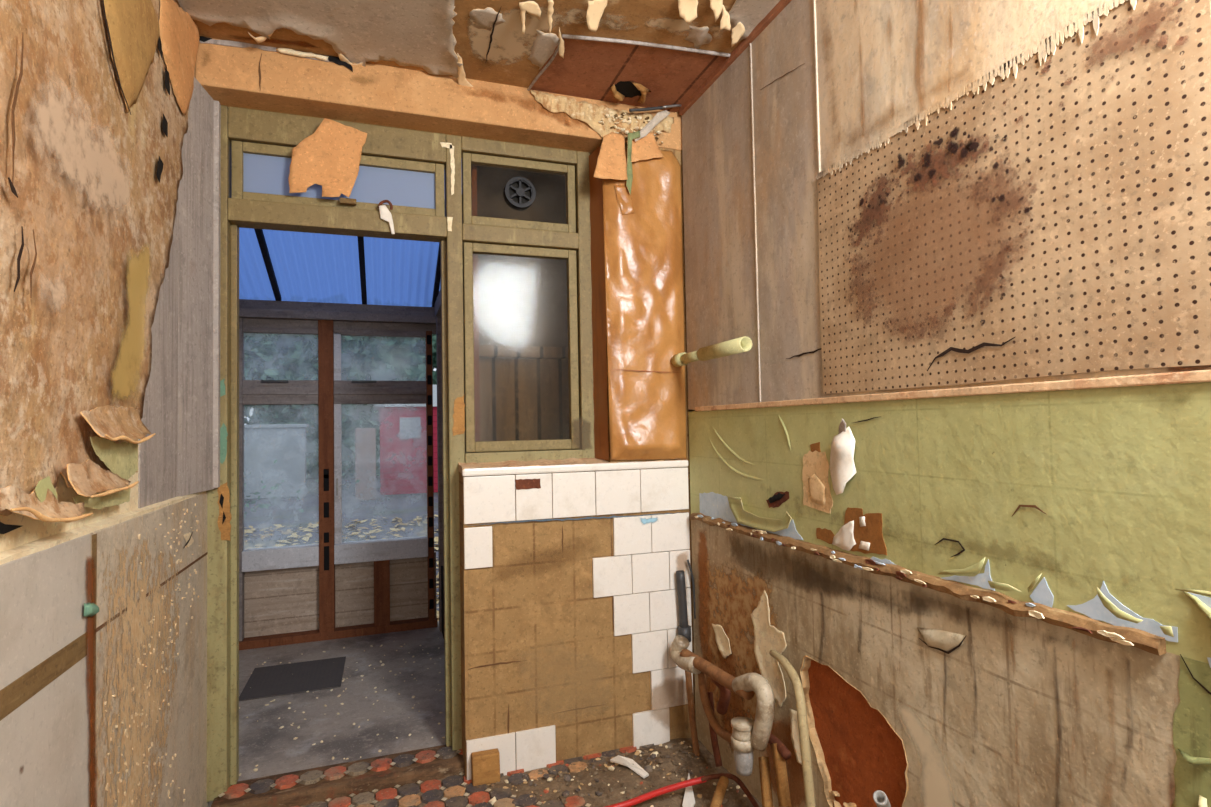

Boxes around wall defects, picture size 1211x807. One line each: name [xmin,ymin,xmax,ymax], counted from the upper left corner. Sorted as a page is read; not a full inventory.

peeling [678,0,745,48]
water stain [1089,0,1188,65]
water stain [847,128,1037,339]
crack [927,337,1015,371]
peeling [808,417,878,505]
peeling [468,519,649,761]
water stain [713,686,757,751]
water stain [706,540,855,677]
spalling [751,590,909,807]
flaking render [938,558,1178,646]
crack [1180,654,1211,695]
water stain [767,721,805,807]